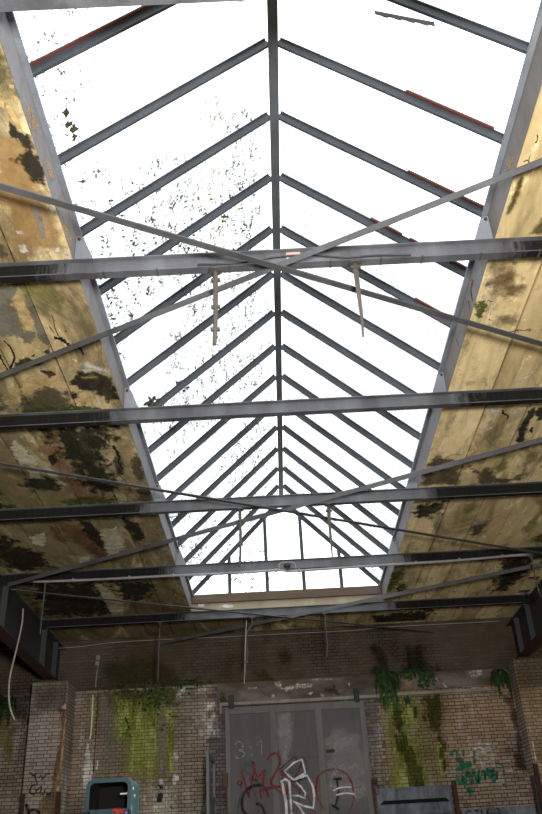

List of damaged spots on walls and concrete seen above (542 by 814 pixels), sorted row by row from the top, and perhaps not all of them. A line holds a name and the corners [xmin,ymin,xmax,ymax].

water stain [0,123,69,258]
crack [49,315,84,355]
water stain [516,407,542,443]
peeling [8,436,66,485]
water stain [18,476,61,492]
water stain [39,424,152,501]